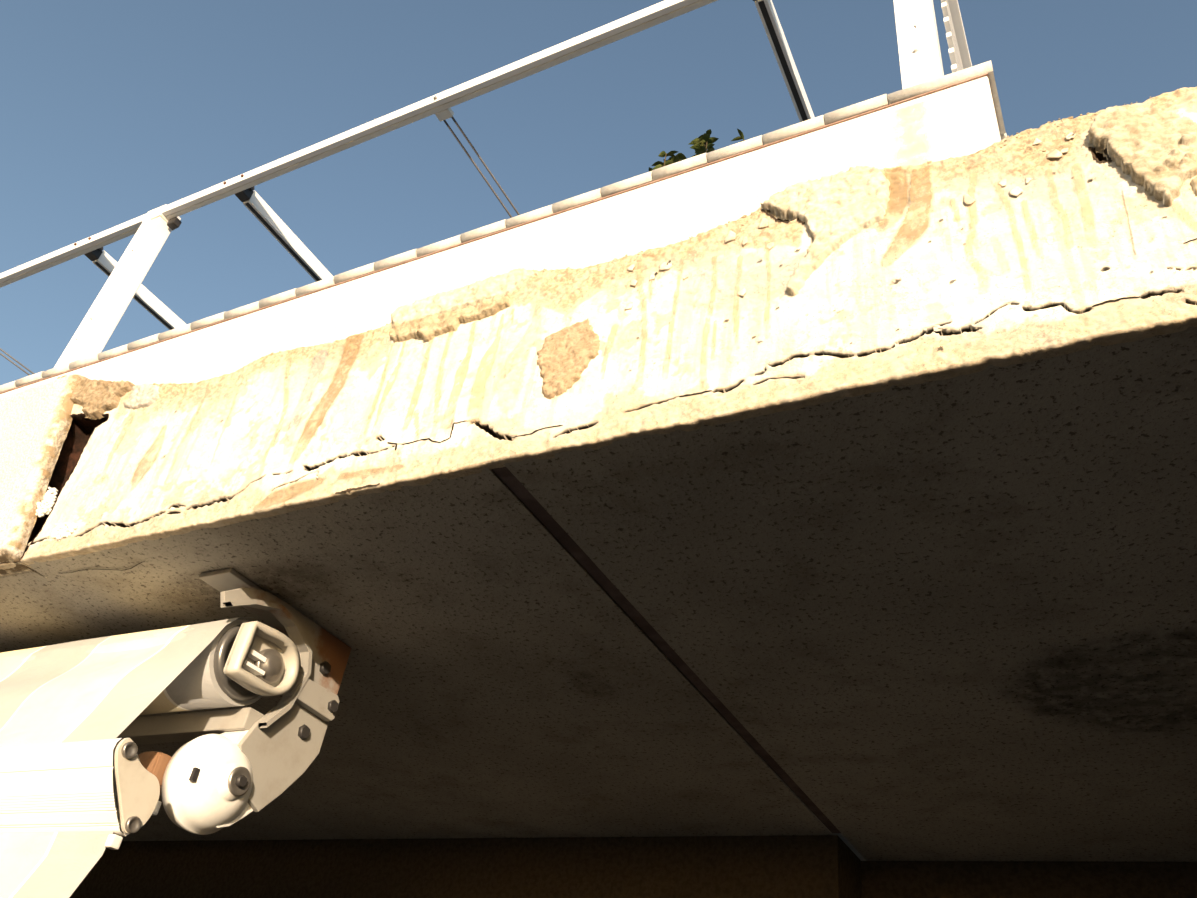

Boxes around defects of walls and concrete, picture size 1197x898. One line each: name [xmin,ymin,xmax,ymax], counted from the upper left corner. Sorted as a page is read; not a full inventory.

rust [884,103,932,255]
peeling [994,113,1097,176]
peeling [719,209,805,246]
rust [994,183,1036,267]
crack [1121,190,1137,255]
rust [701,256,717,363]
spalling [57,375,160,420]
rust [368,341,406,420]
rust [406,309,514,434]
spalling [526,318,600,400]
crack [28,238,1197,546]
crack [69,561,145,573]